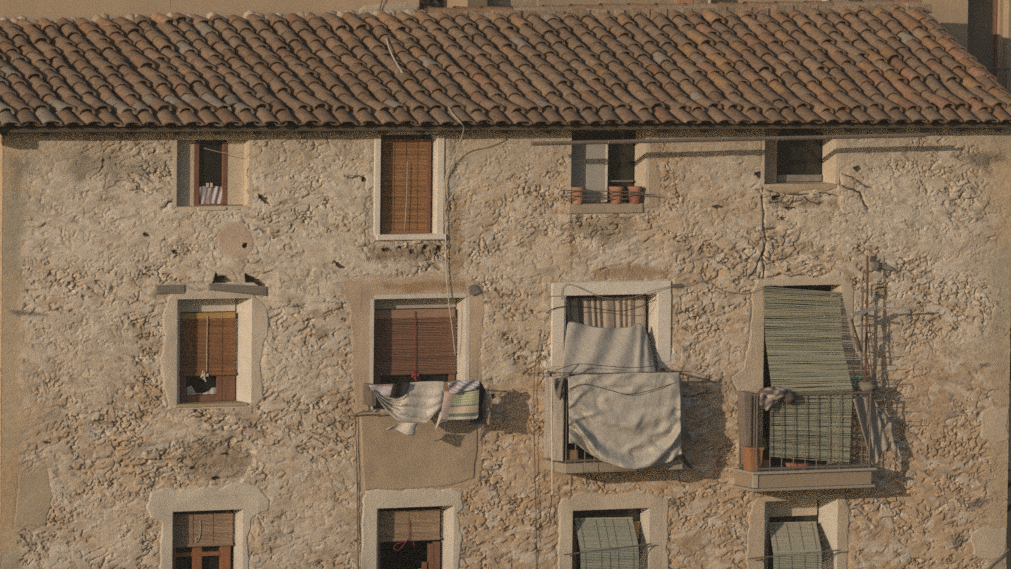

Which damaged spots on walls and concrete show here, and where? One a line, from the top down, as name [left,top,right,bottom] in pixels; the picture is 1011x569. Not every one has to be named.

crack [749,174,872,279]